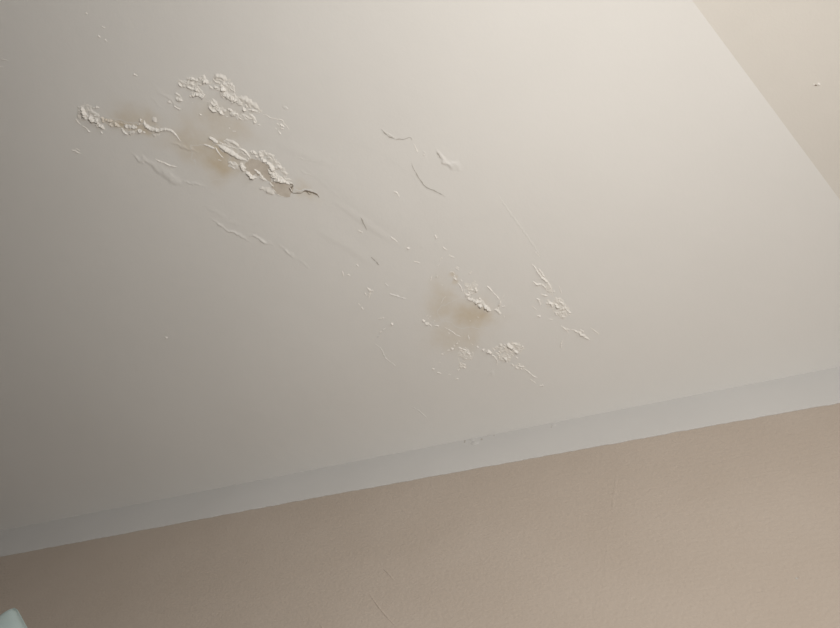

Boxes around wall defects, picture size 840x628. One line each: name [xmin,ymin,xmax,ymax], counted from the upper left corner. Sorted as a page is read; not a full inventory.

peeling [76,103,180,140]
leakage [85,83,278,200]
peeling [168,73,290,134]
peeling [204,128,293,197]
crack [289,184,319,197]
leakage [286,173,328,207]
leakage [409,261,523,366]